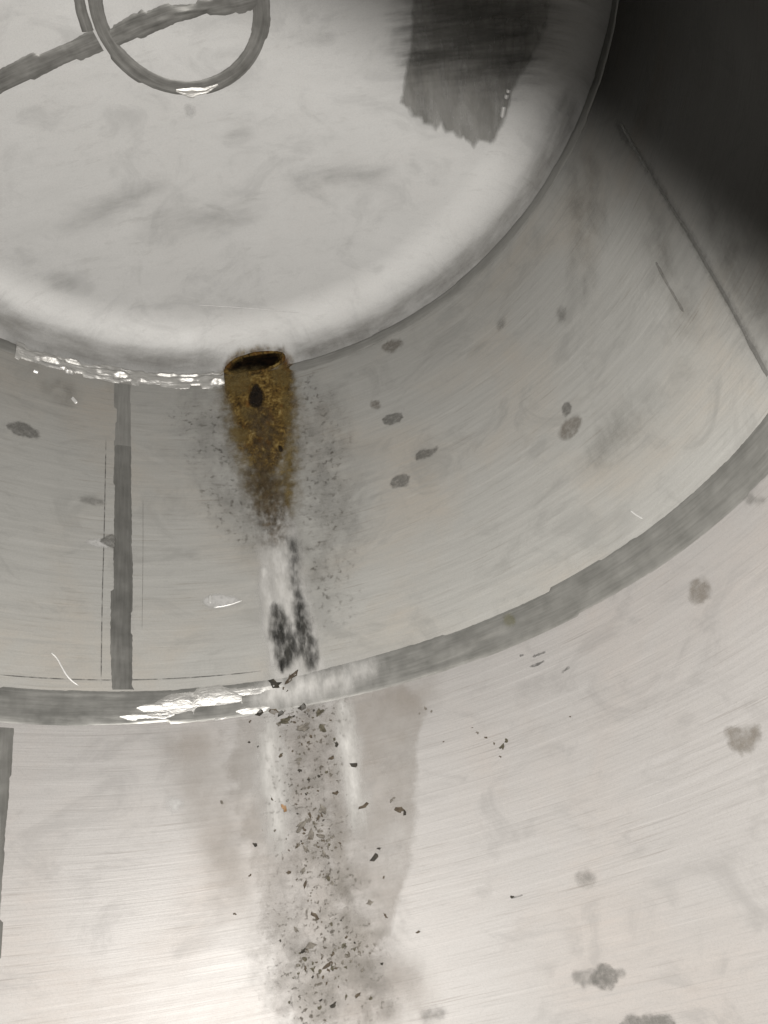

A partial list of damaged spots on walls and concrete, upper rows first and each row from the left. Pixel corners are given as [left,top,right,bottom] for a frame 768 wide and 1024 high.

rust [224,349,299,535]
leakage [254,508,373,706]
leakage [261,723,285,834]
leakage [338,702,362,818]